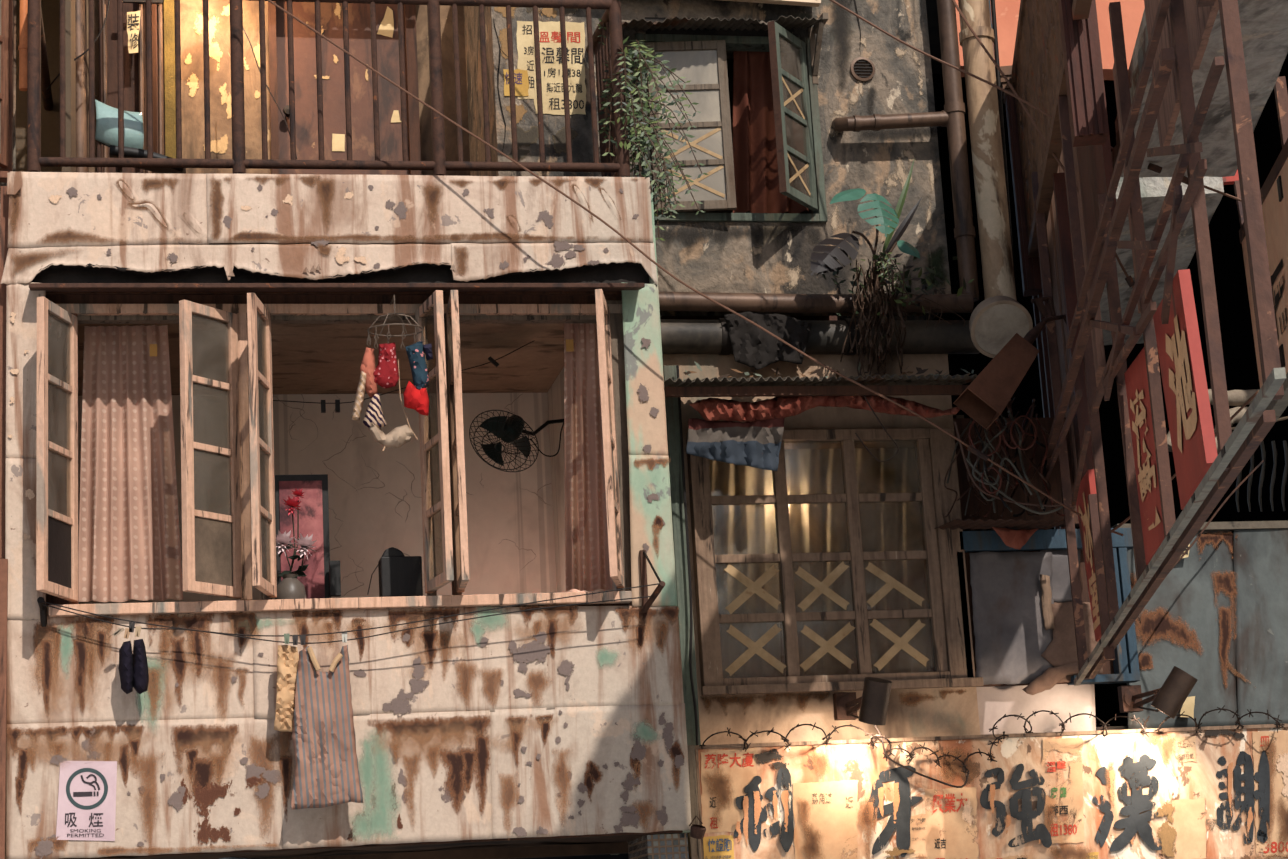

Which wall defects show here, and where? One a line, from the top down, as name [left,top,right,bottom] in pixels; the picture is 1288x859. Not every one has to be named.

peeling [637,383,659,418]
corrosion [292,610,368,662]
peeling [382,656,429,718]
corrosion [388,607,460,676]
peeling [500,680,533,698]
peeling [508,631,575,690]
corrosion [520,604,578,657]
corrosion [615,606,679,652]
corrosion [1135,607,1201,670]
corrosion [507,714,553,765]
corrosion [369,715,491,821]
corrosion [584,761,603,801]